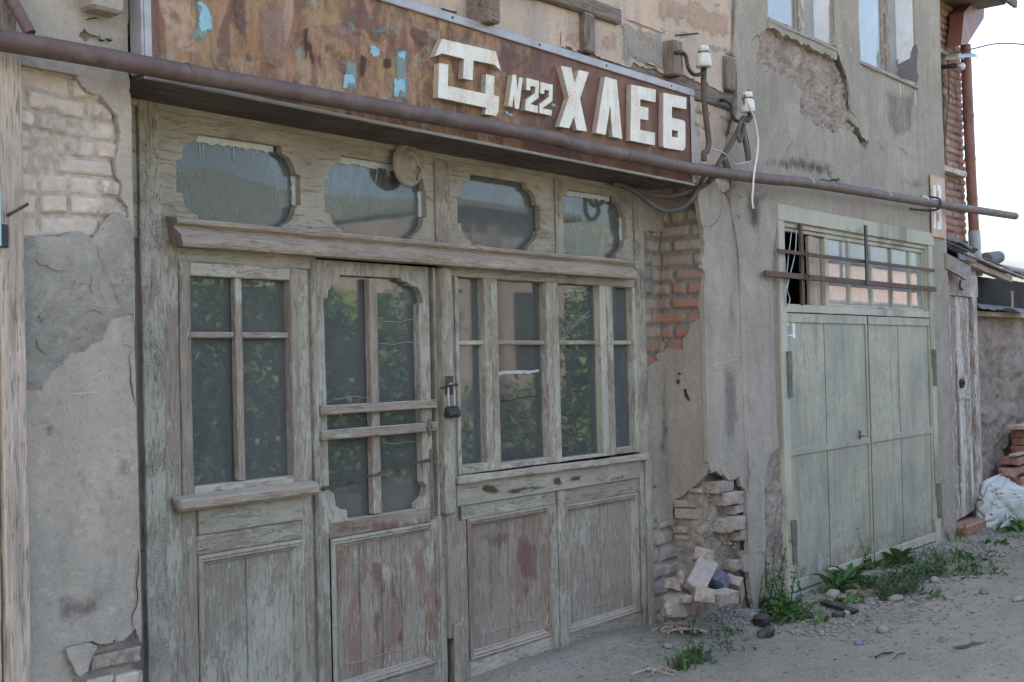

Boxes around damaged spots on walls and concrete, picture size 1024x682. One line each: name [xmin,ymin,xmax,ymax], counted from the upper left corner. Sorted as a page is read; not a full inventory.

spalling [757,21,867,148]